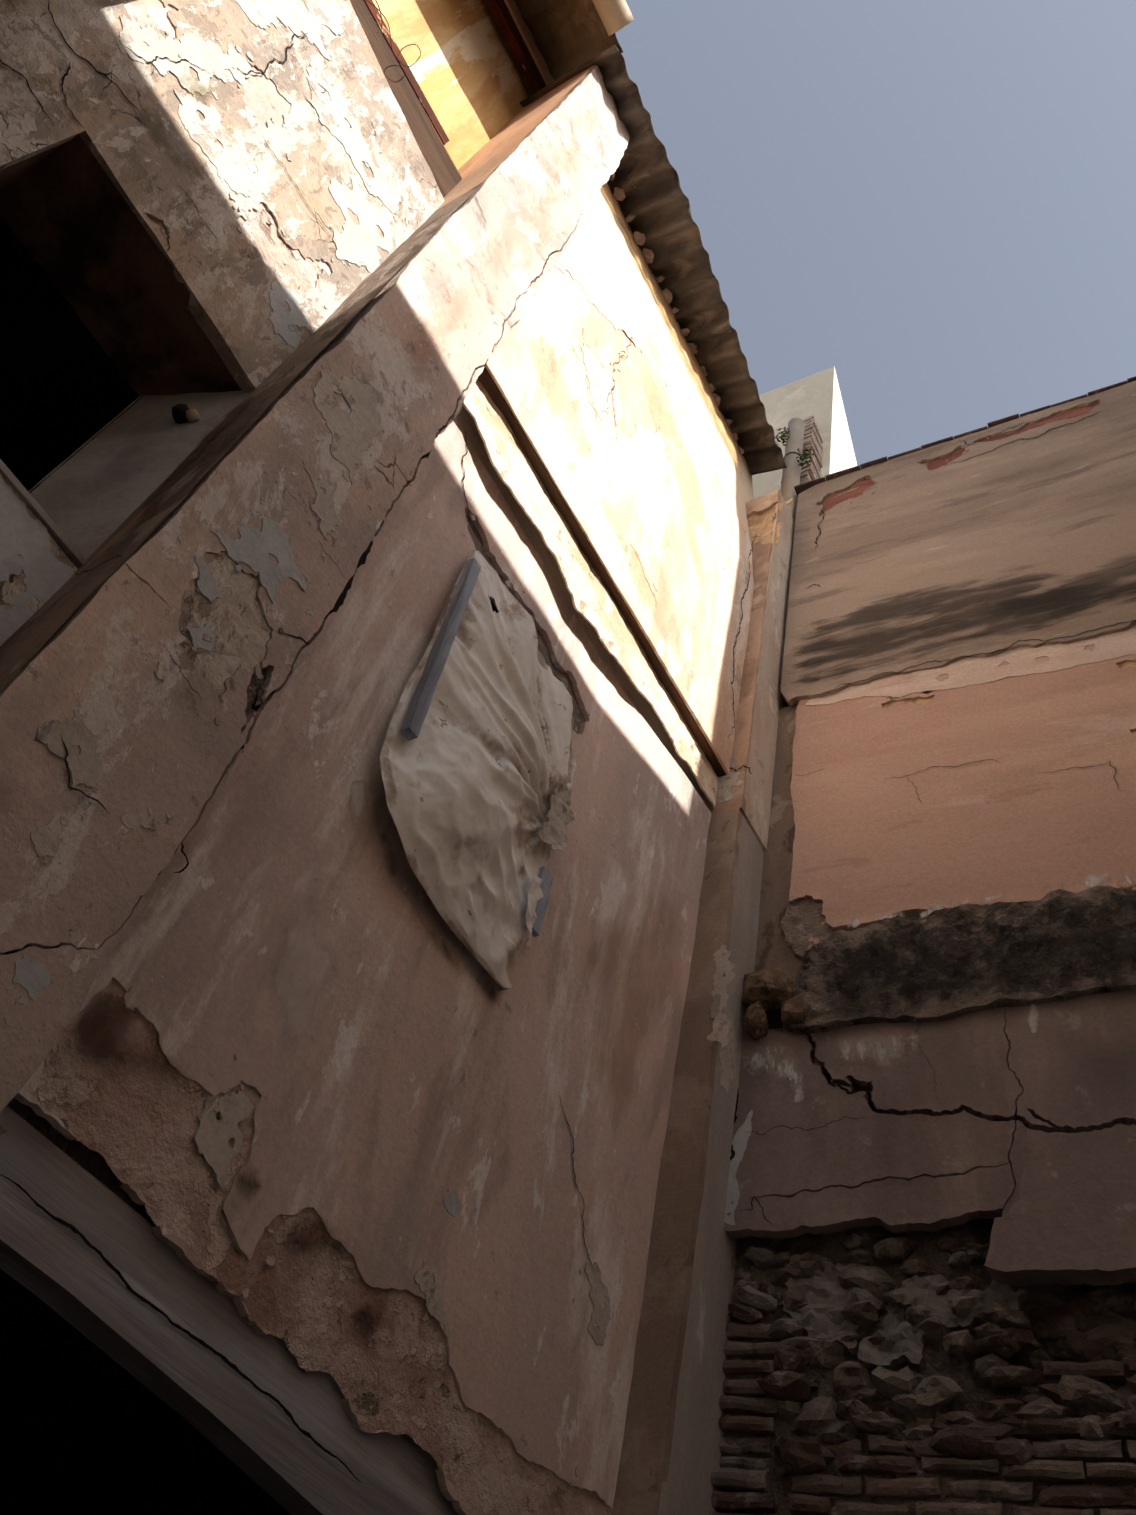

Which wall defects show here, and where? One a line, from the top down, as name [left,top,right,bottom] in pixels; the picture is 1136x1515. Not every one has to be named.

peeling [118,0,405,352]
flaking render [922,403,1100,470]
peeling [0,473,74,646]
flaking render [154,496,314,726]
crack [728,536,757,774]
water stain [796,574,1136,682]
crack [823,620,1136,693]
crack [0,945,62,955]
water stain [831,874,1136,1033]
crack [730,1050,878,1161]
crack [1005,1035,1070,1133]
flaking render [35,979,611,1515]